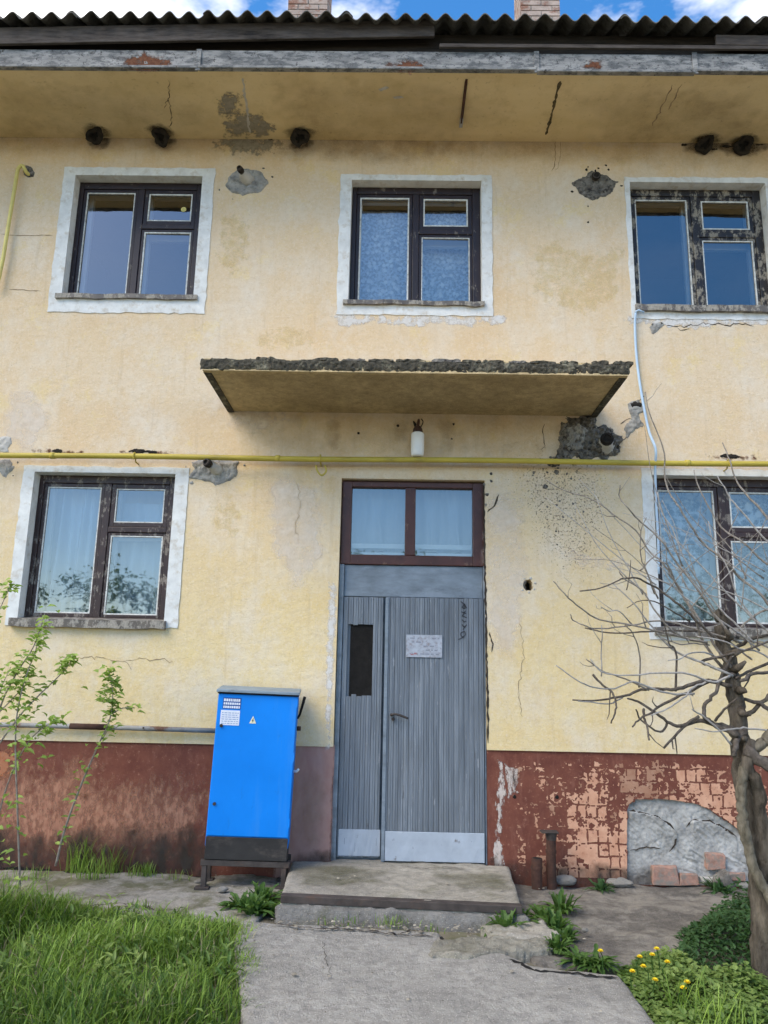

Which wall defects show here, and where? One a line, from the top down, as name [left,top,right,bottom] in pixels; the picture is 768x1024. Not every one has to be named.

flaking render [650,322,664,334]
spalling [200,356,634,375]
flaking render [547,400,644,475]
crack [59,656,170,667]
crack [517,625,525,716]
flaking render [491,760,749,886]
crack [510,959,617,978]